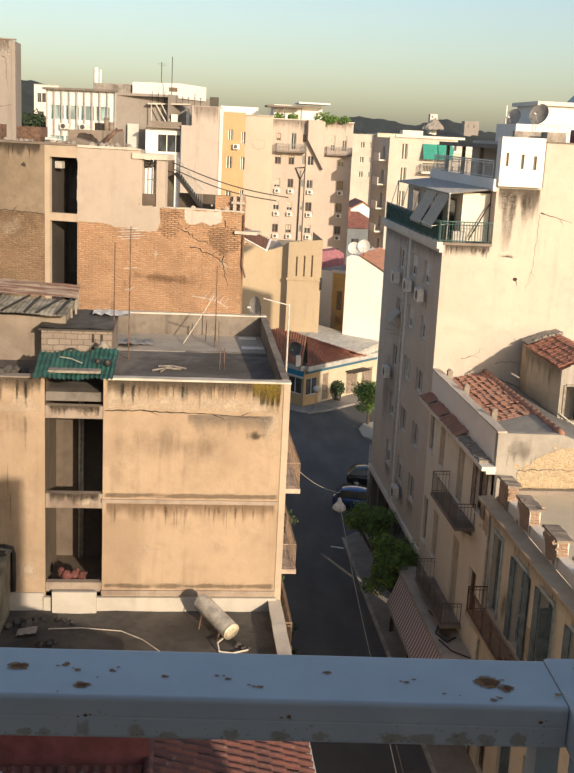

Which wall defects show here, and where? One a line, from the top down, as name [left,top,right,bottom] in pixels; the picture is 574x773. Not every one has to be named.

leakage [499,188,540,210]
spalling [158,208,186,241]
crack [181,227,228,286]
spalling [204,225,249,257]
crack [514,212,571,288]
leakage [0,377,41,397]
leakage [50,380,254,412]
crack [105,409,264,420]
leakage [250,401,275,430]
rust [473,676,514,701]